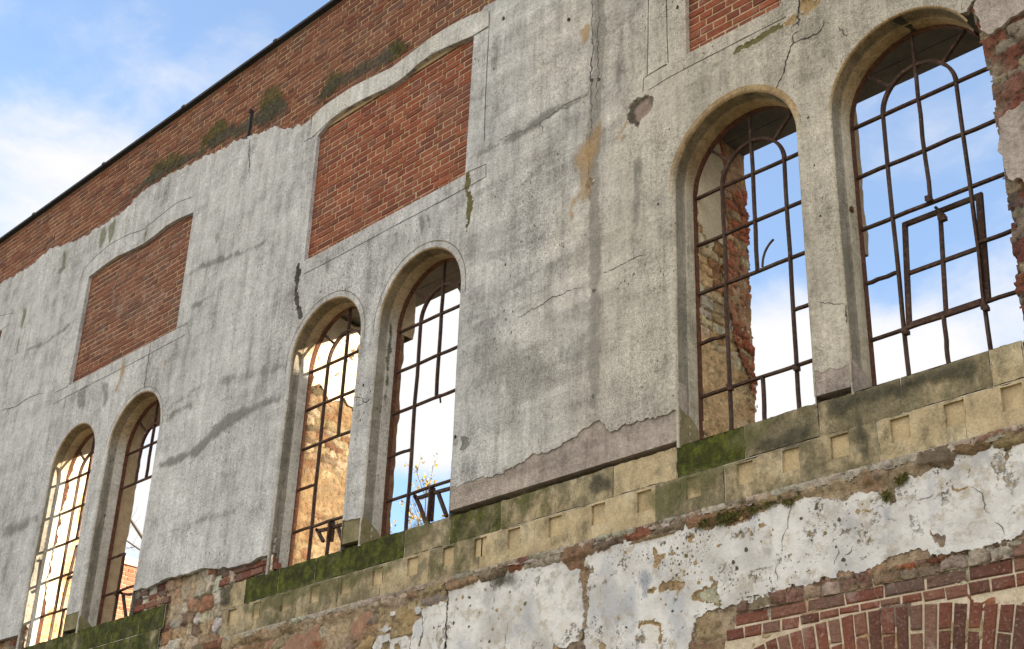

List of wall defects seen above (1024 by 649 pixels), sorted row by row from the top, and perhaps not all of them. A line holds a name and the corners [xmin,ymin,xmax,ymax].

crack [776,0,847,88]
crack [501,0,600,197]
spalling [626,94,654,128]
damp [133,99,288,195]
spalling [464,171,474,232]
spalling [459,436,470,453]
flaking render [133,590,171,613]
flaking render [219,557,282,587]